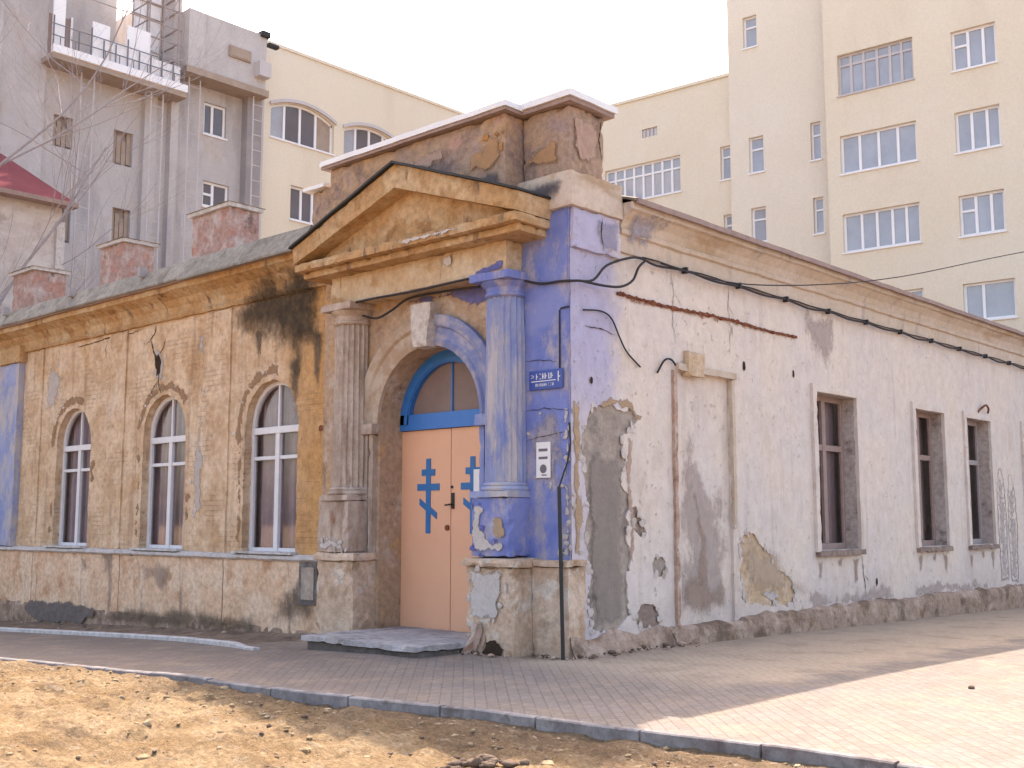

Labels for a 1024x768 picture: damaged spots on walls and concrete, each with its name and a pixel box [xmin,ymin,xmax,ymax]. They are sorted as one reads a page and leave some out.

spalling [575,117,602,161]
crack [79,328,166,393]
damp [241,271,321,409]
peeling [461,502,507,656]
spalling [527,398,664,635]
spalling [738,527,797,609]